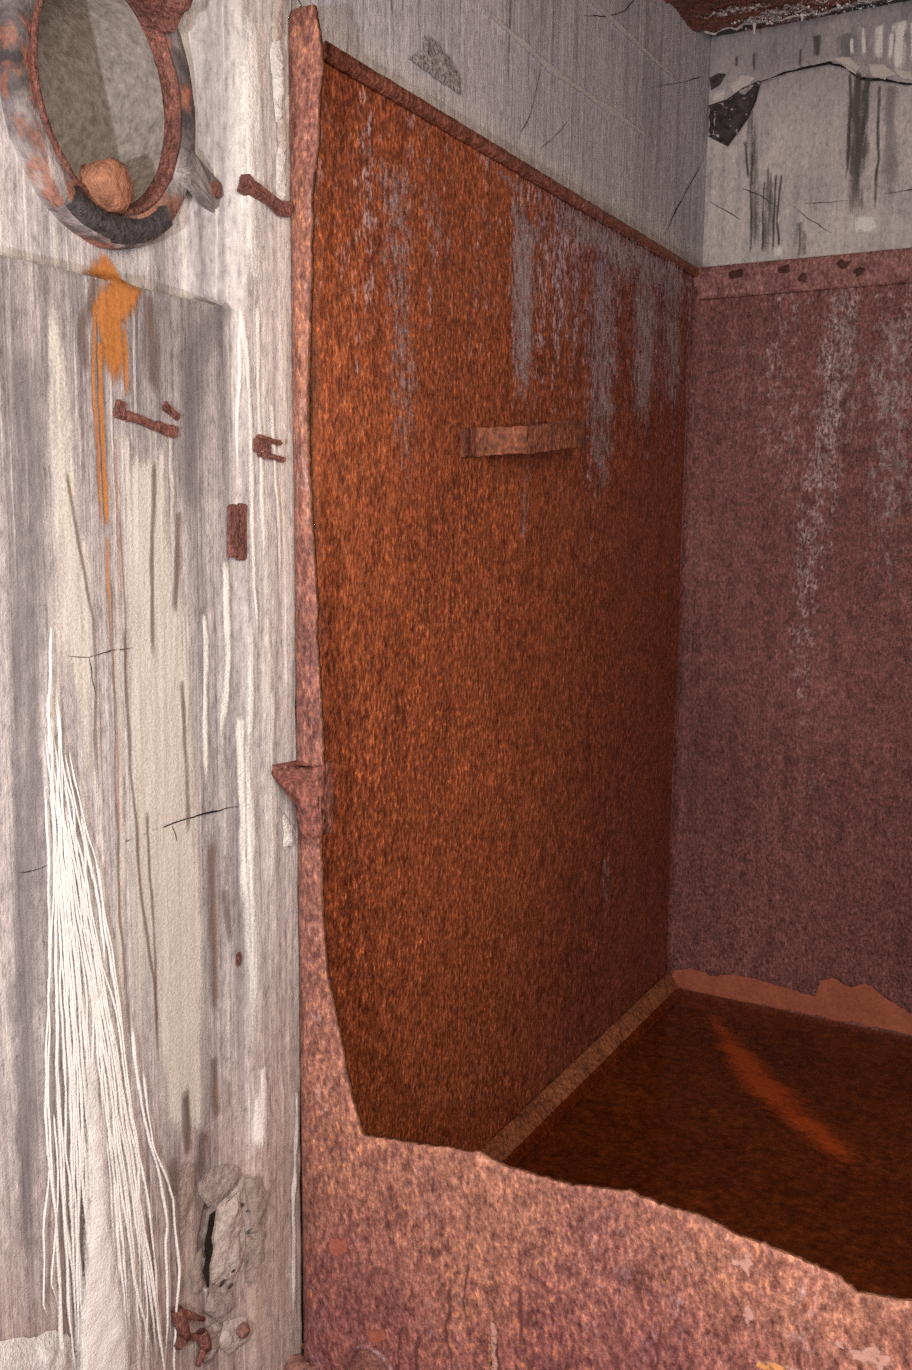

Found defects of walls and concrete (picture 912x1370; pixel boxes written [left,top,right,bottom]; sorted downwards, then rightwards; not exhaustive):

damp [704,0,880,35]
damp [841,20,912,69]
crack [662,56,912,102]
spalling [708,73,762,146]
damp [846,74,894,234]
rust [84,253,140,658]
rust [672,968,912,1035]
spalling [171,1160,271,1367]
peeling [731,1253,753,1276]
peeling [743,1306,754,1326]
rust [756,1362,784,1370]
peeling [835,1340,894,1370]